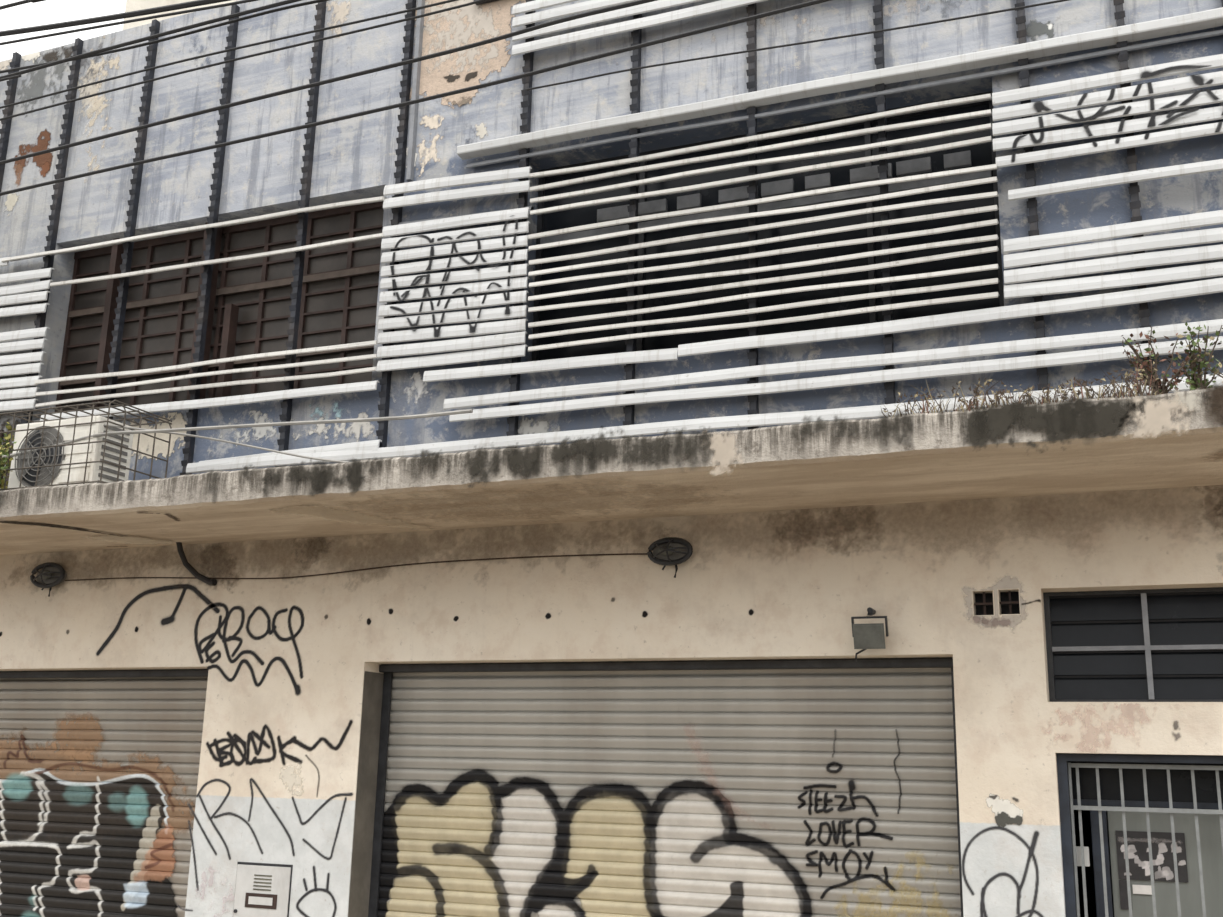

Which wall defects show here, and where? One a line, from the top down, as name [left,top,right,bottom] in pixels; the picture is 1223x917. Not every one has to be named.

peeling [326,2,351,34]
peeling [0,52,40,70]
peeling [79,50,119,132]
spalling [406,0,526,177]
corrosion [14,129,53,185]
peeling [5,193,18,211]
water stain [794,414,911,445]
water stain [963,397,1139,448]
water stain [1203,383,1223,423]
water stain [420,426,709,487]
water stain [242,459,381,496]
peeling [986,794,1023,827]